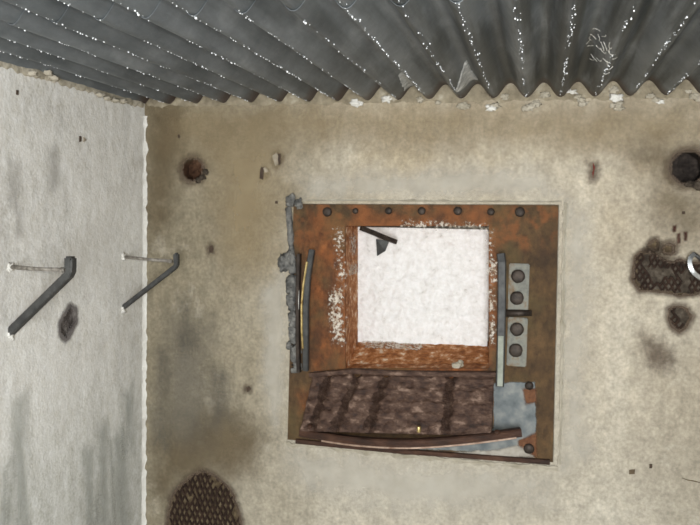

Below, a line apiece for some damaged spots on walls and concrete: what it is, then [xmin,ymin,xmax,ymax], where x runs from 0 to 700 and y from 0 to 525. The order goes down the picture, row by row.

flaking render [630,237,700,334]
rust [523,388,536,404]
flaking render [165,468,243,525]